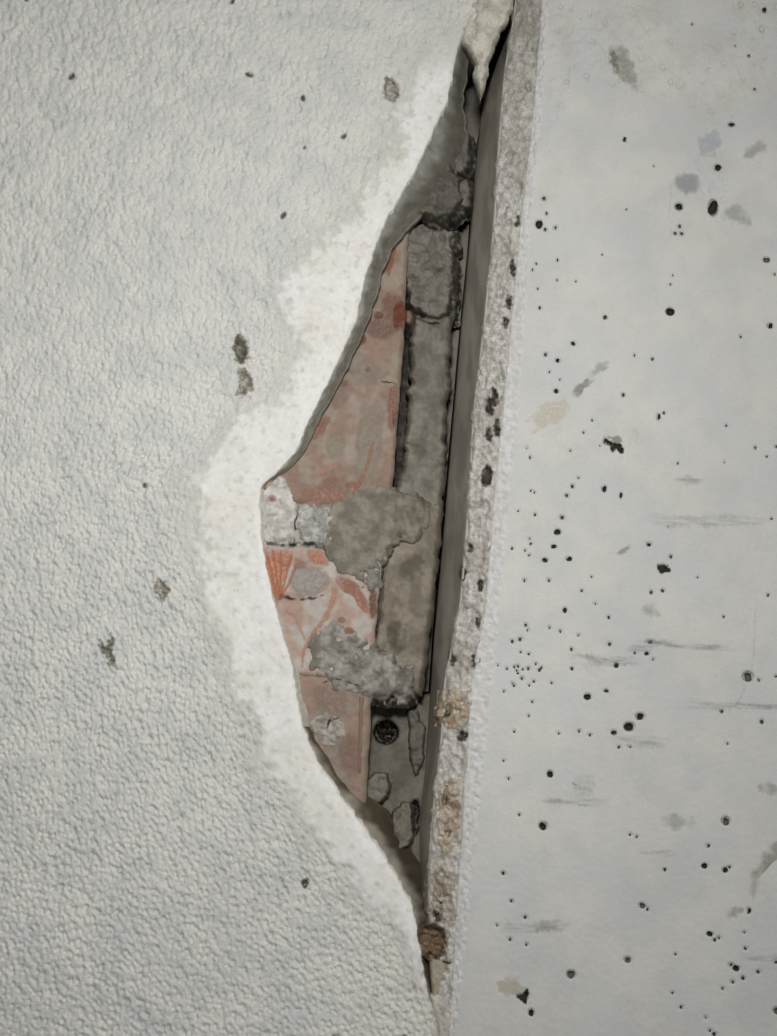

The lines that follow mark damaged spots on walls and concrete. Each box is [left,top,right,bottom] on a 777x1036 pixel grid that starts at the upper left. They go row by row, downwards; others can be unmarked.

spalling [172,0,514,1002]